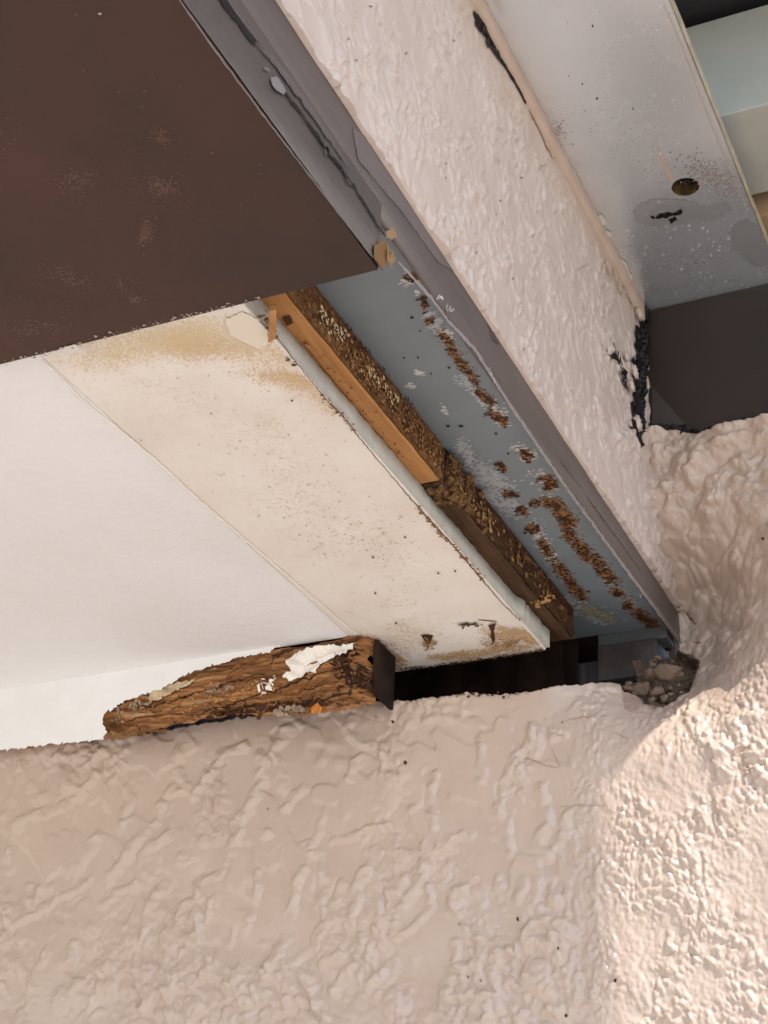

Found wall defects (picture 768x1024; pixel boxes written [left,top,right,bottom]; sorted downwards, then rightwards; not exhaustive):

water stain [633,148,754,227]
water stain [730,220,768,268]
peeling [225,312,268,349]
rust [404,272,510,428]
water stain [47,308,541,672]
rust [500,474,661,629]
rust [421,635,438,651]
rust [457,620,496,643]
peeling [621,650,699,712]